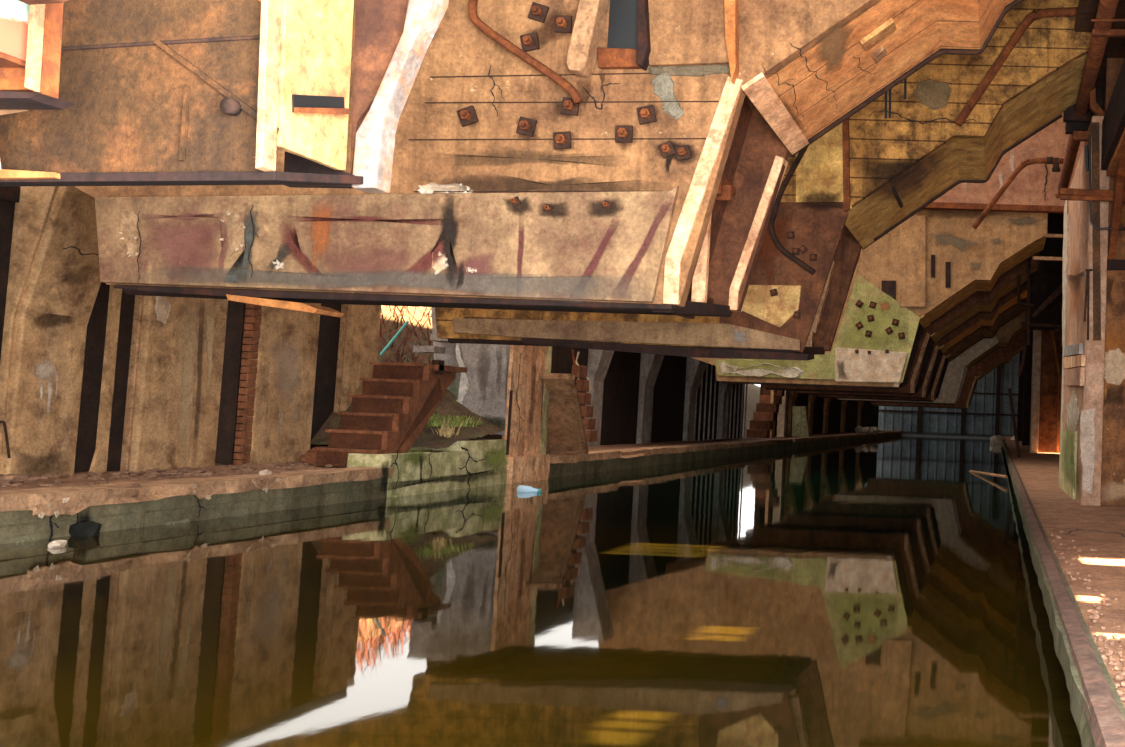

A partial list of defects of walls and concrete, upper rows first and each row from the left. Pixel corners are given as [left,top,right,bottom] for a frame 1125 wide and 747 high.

crack [488,65,504,116]
crack [586,83,620,110]
spalling [652,66,685,119]
crack [763,43,838,121]
crack [870,110,977,124]
rust [592,201,620,216]
rust [582,230,614,279]
rust [618,213,665,288]
spalling [1104,348,1125,385]